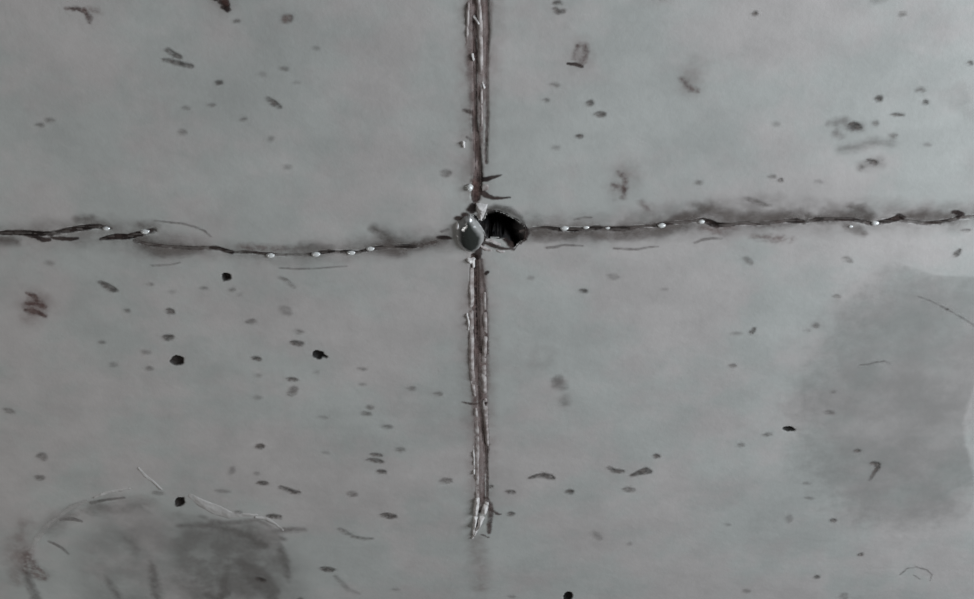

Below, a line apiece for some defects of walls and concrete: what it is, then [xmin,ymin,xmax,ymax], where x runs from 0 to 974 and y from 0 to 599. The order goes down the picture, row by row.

crack [462,0,511,204]
crack [0,224,276,255]
crack [307,230,452,255]
hole [455,202,529,264]
crack [520,206,970,238]
crack [464,253,500,539]